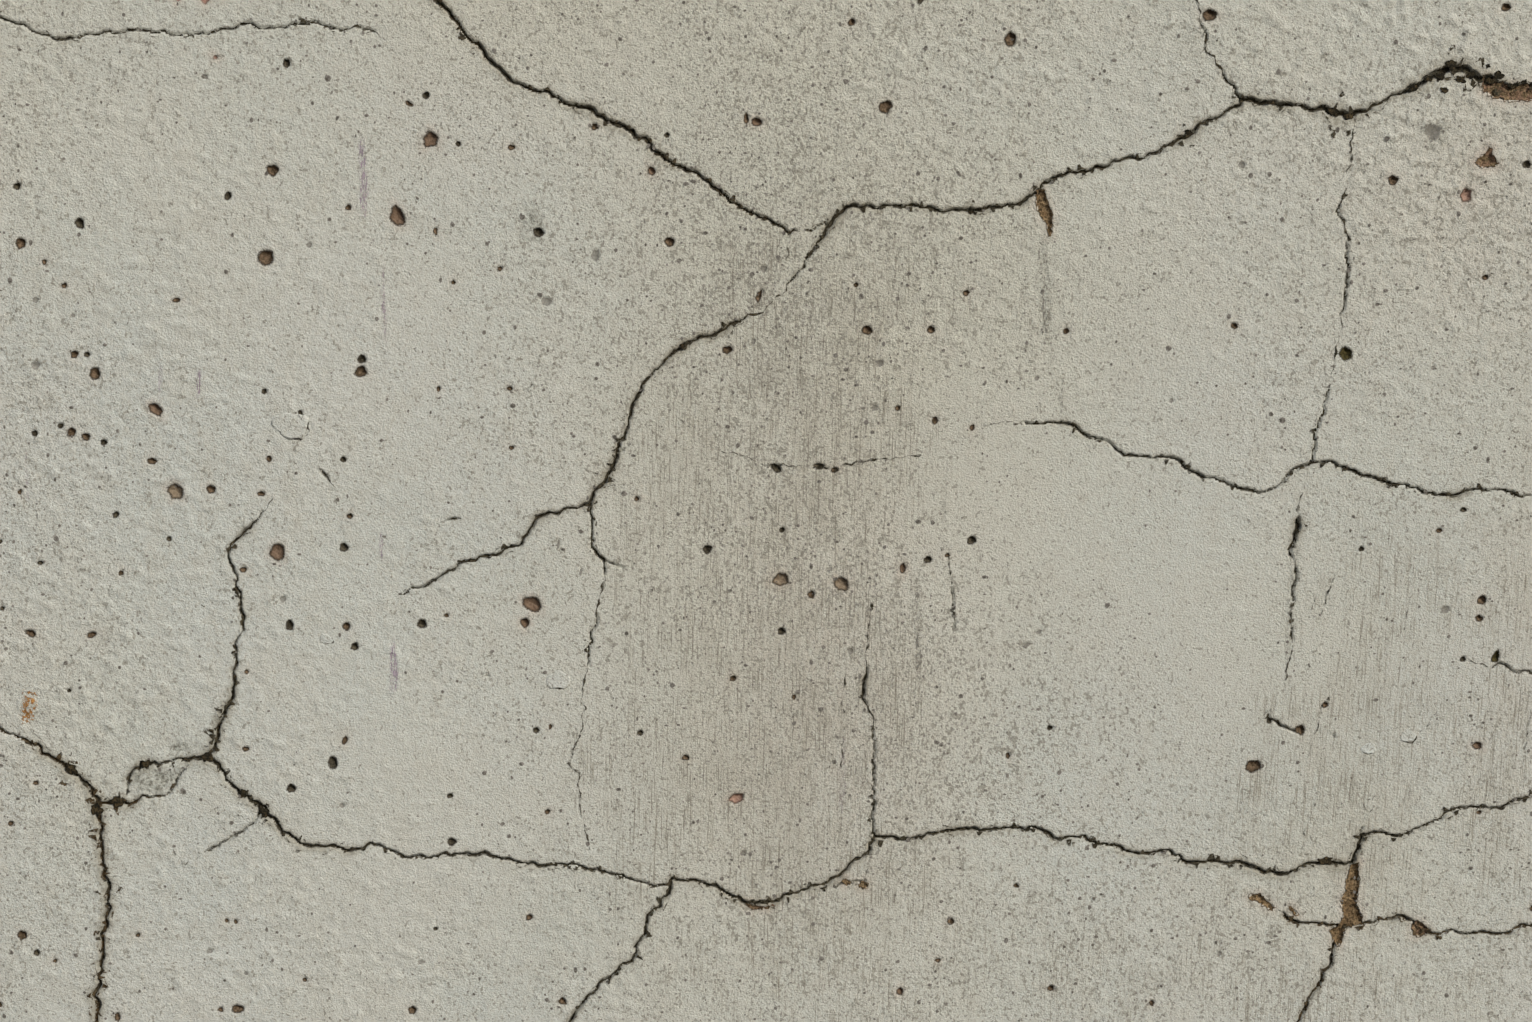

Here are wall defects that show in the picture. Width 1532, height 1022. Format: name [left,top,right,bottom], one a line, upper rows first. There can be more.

crack [0,11,385,41]
crack [398,0,1532,849]
crack [0,499,1532,1022]